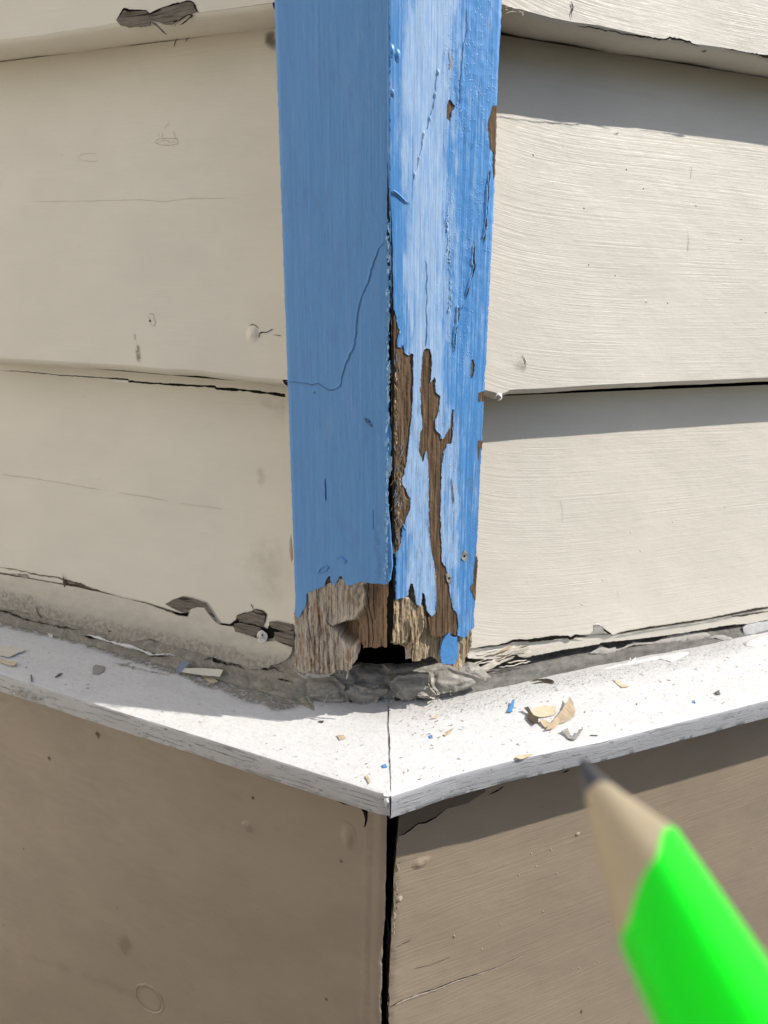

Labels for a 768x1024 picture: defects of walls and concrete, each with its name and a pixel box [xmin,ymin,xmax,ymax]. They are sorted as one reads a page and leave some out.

peeling [391,312,458,637]
peeling [461,550,478,600]